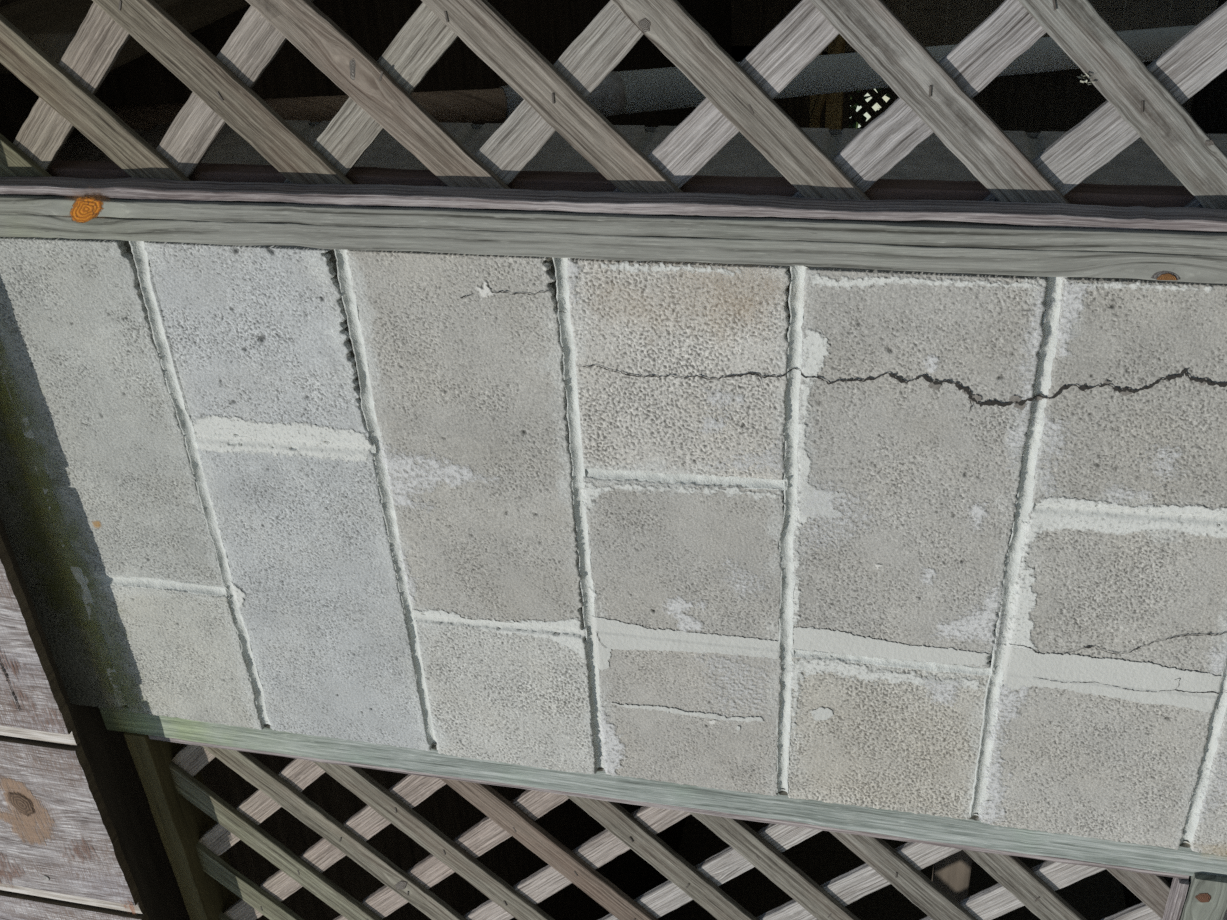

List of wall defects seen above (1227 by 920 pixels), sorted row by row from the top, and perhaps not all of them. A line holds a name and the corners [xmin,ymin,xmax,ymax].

crack [576,365,1227,412]
crack [1010,632,1227,694]